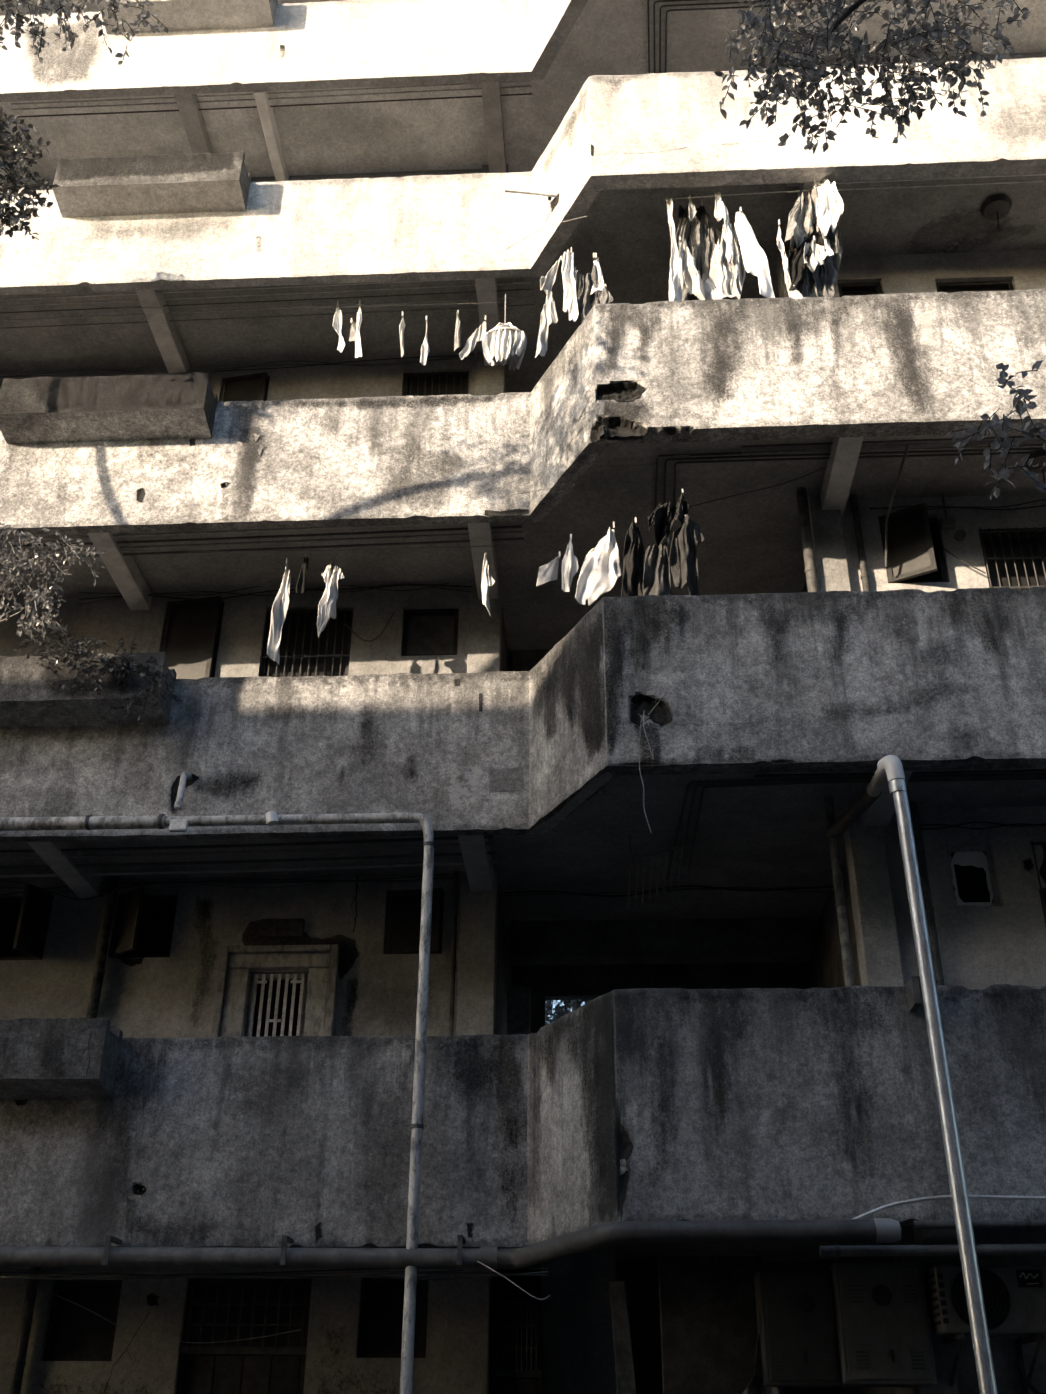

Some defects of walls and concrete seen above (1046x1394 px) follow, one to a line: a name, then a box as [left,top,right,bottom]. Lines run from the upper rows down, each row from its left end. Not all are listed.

leakage [296,394,496,409]
leakage [599,302,661,373]
spalling [590,382,693,442]
leakage [701,302,748,399]
leakage [780,297,934,412]
leakage [222,404,257,521]
leakage [388,440,459,506]
leakage [751,591,885,663]
leakage [532,596,690,757]
spalling [526,694,676,835]
peeling [241,920,359,980]
leakage [436,989,748,1227]